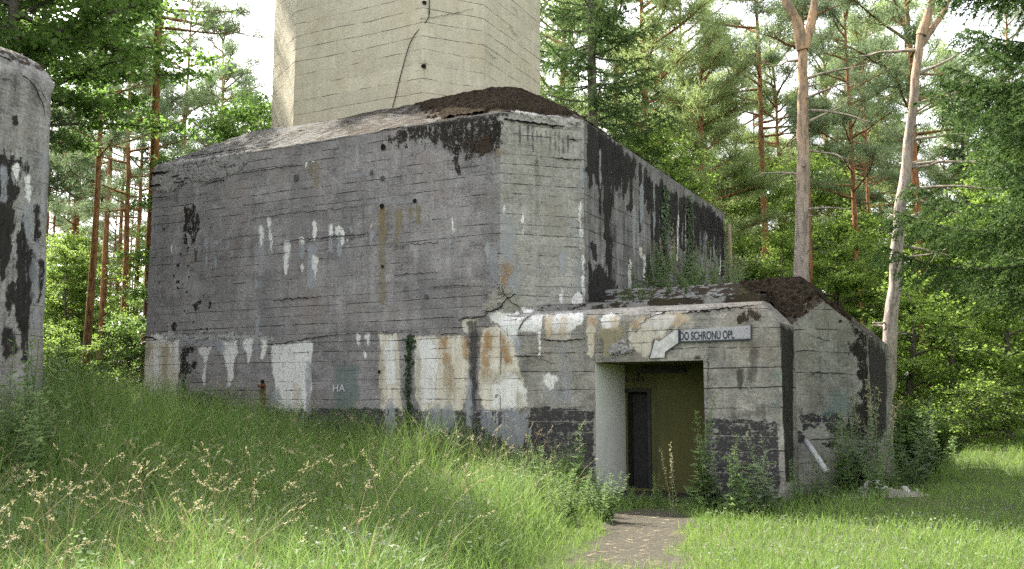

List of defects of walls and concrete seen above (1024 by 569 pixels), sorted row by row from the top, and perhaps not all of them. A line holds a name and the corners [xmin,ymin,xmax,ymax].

water stain [377,109,515,175]
water stain [0,148,46,363]
water stain [143,204,268,401]
crack [441,286,582,364]
water stain [485,123,725,359]
water stain [839,319,887,443]